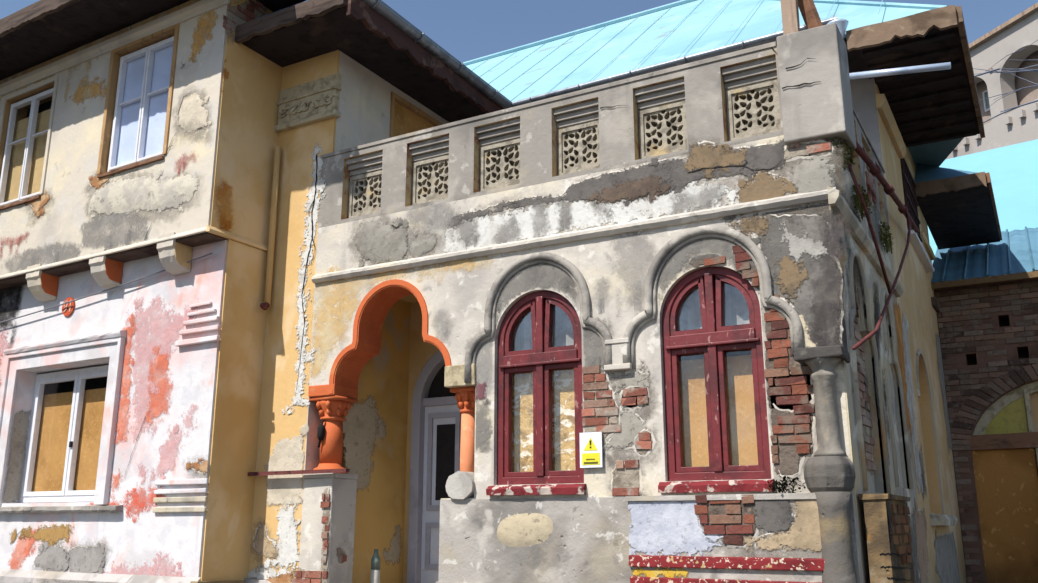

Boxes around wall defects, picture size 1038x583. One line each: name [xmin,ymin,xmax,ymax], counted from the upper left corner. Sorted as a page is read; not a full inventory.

spalling [188,0,267,62]
crack [771,47,821,89]
spalling [3,410,31,503]
spalling [8,524,182,583]
peeling [90,297,208,522]
peeling [248,423,347,583]
crack [296,154,317,390]
peeling [281,143,358,415]
peeling [343,395,386,492]
peeling [442,139,877,479]
peeling [581,360,822,578]
spalling [890,305,960,583]